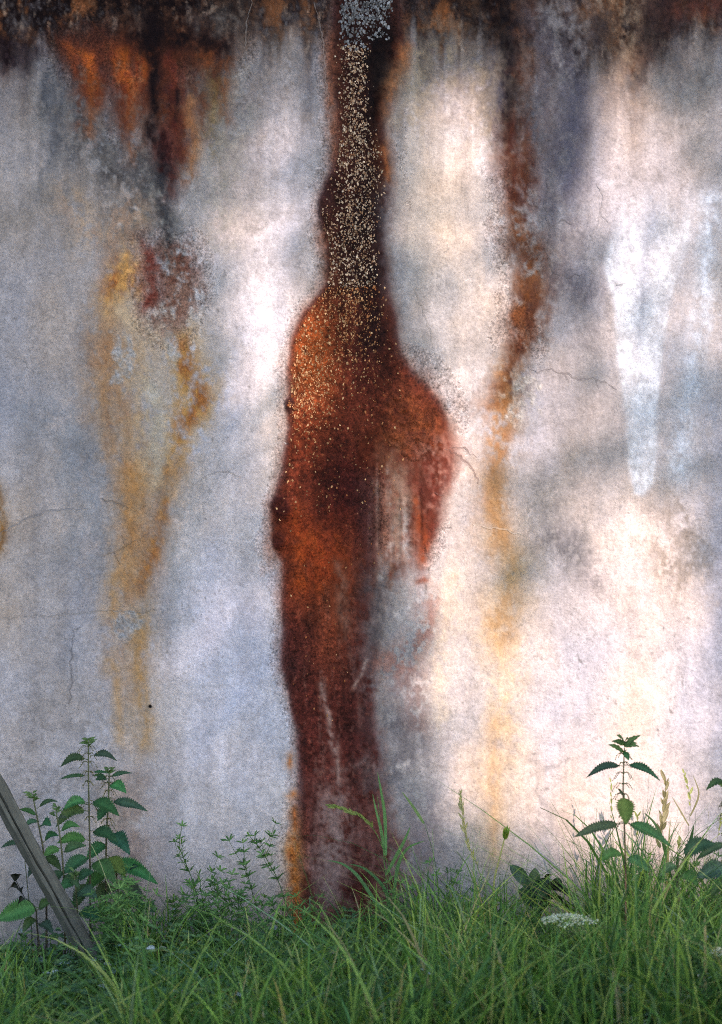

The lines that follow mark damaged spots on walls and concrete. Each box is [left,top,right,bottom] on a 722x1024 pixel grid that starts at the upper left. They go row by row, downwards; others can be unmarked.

rust [77,555,166,762]
rust [37,1,259,497]
leakage [0,0,321,302]
rust [254,0,561,947]
leakage [358,0,722,705]